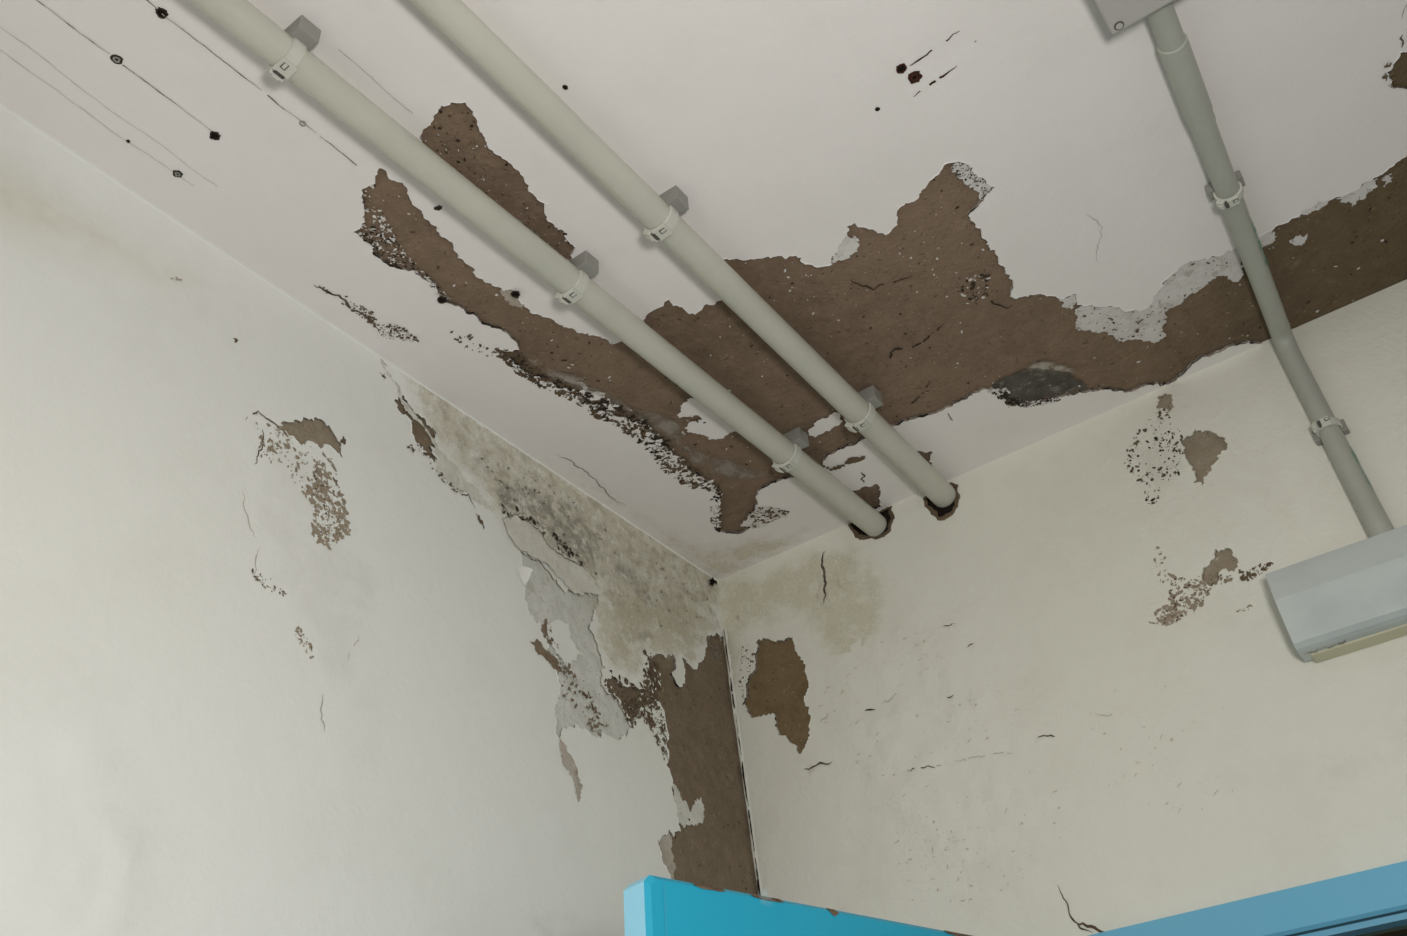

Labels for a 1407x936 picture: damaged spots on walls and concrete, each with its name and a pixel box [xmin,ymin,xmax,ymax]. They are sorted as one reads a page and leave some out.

flaking render [1382,34,1407,90]
flaking render [419,101,576,261]
flaking render [1258,155,1407,329]
peeling [246,411,351,550]
flaking render [352,167,795,534]
damp [425,396,722,651]
flaking render [642,299,895,540]
spalling [923,482,960,521]
flaking render [723,160,1271,504]
peeling [1149,546,1274,626]
flaking render [517,551,812,902]
crack [1057,885,1105,933]